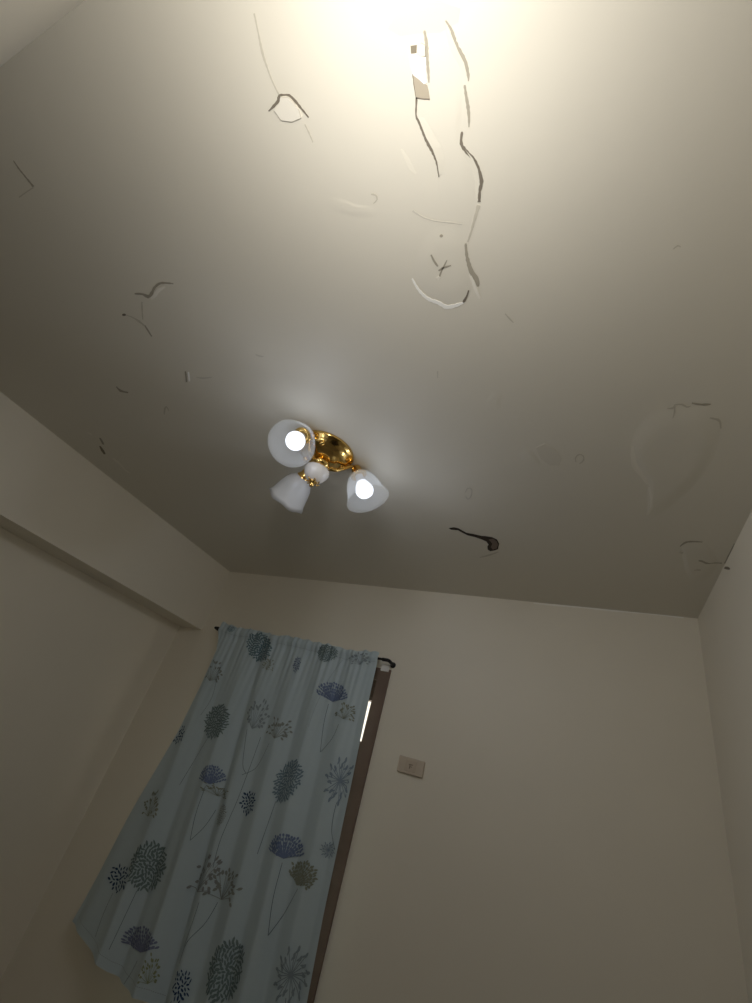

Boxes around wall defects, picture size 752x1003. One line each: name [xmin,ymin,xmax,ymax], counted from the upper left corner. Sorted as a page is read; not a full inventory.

flaking render [410,42,430,99]
peeling [274,97,301,122]
peeling [412,278,464,309]